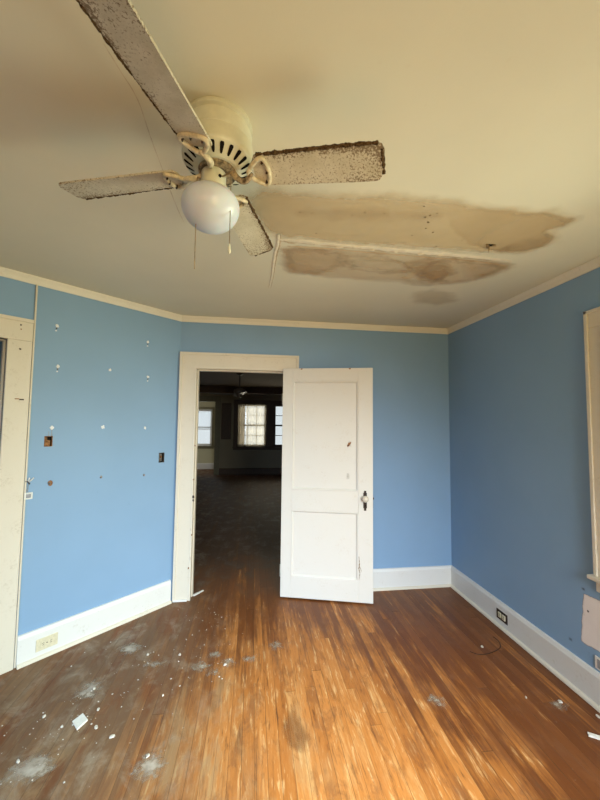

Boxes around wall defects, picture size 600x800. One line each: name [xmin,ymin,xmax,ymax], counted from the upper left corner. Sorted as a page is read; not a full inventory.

water stain [245,193,563,269]